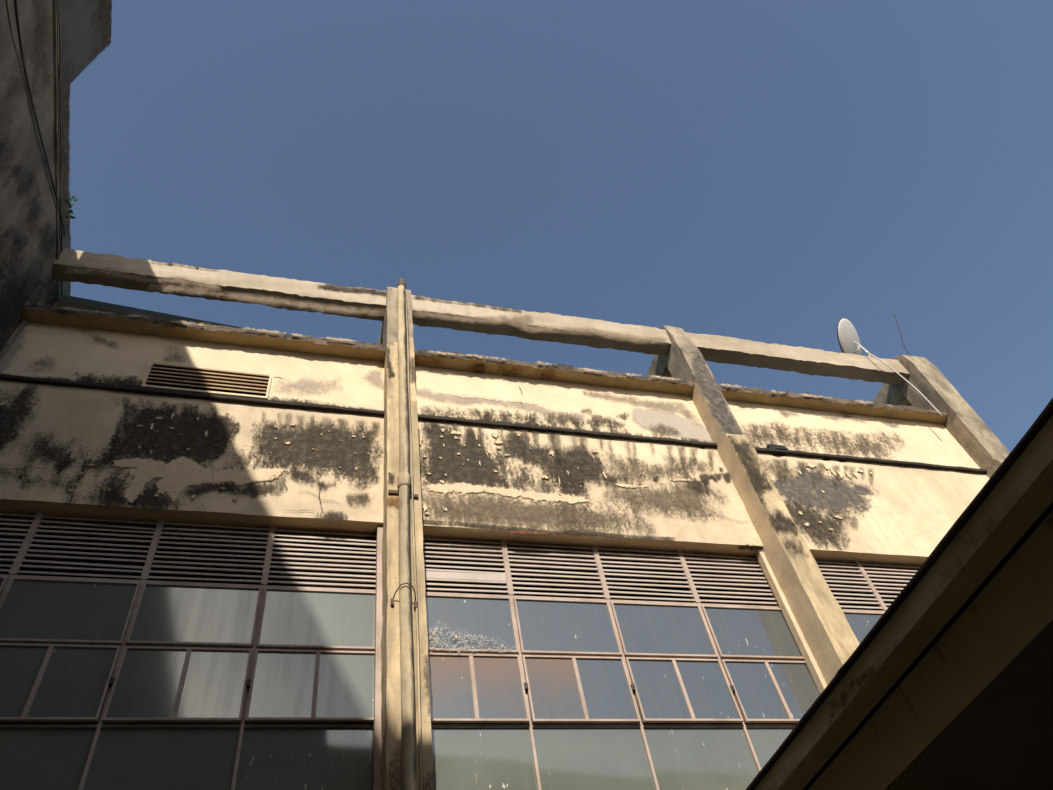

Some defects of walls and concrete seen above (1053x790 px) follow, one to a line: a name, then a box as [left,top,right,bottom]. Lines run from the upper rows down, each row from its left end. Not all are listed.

leakage [0,1,72,349]
leakage [68,261,386,315]
leakage [0,359,382,521]
crack [283,478,366,513]
leakage [418,406,731,535]
leakage [692,350,900,553]